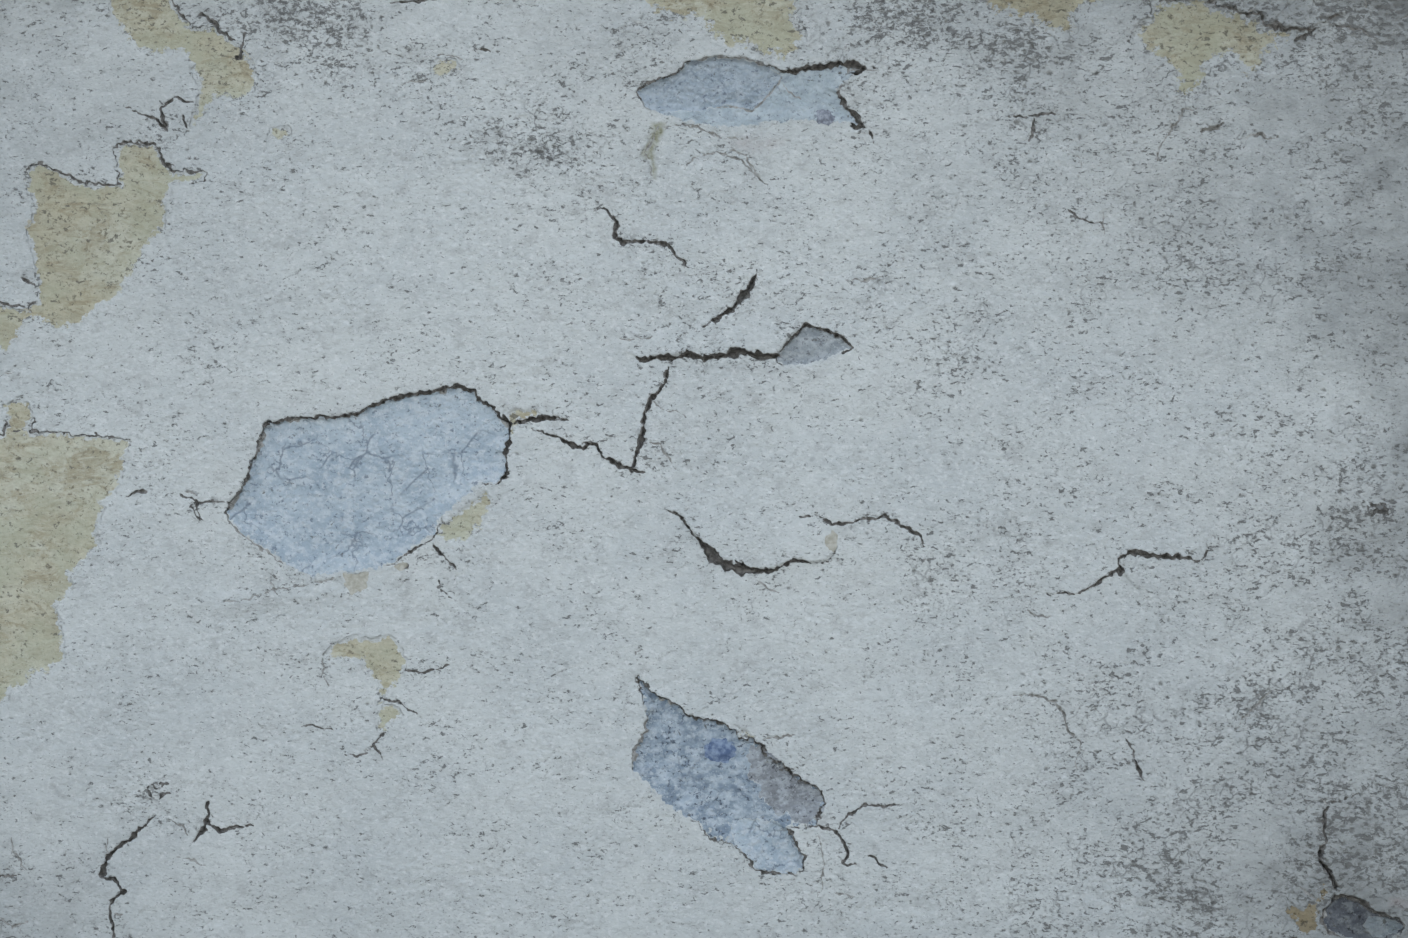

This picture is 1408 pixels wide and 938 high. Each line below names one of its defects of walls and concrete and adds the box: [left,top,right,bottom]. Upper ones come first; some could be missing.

flaking render [636,0,878,185]
flaking render [1131,0,1308,101]
crack [1148,0,1372,42]
flaking render [0,142,207,361]
crack [597,207,692,268]
crack [531,269,780,474]
flaking render [0,396,130,707]
flaking render [185,383,569,603]
crack [668,510,925,593]
crack [1027,547,1209,618]
crack [98,801,254,938]
flaking render [631,675,896,897]